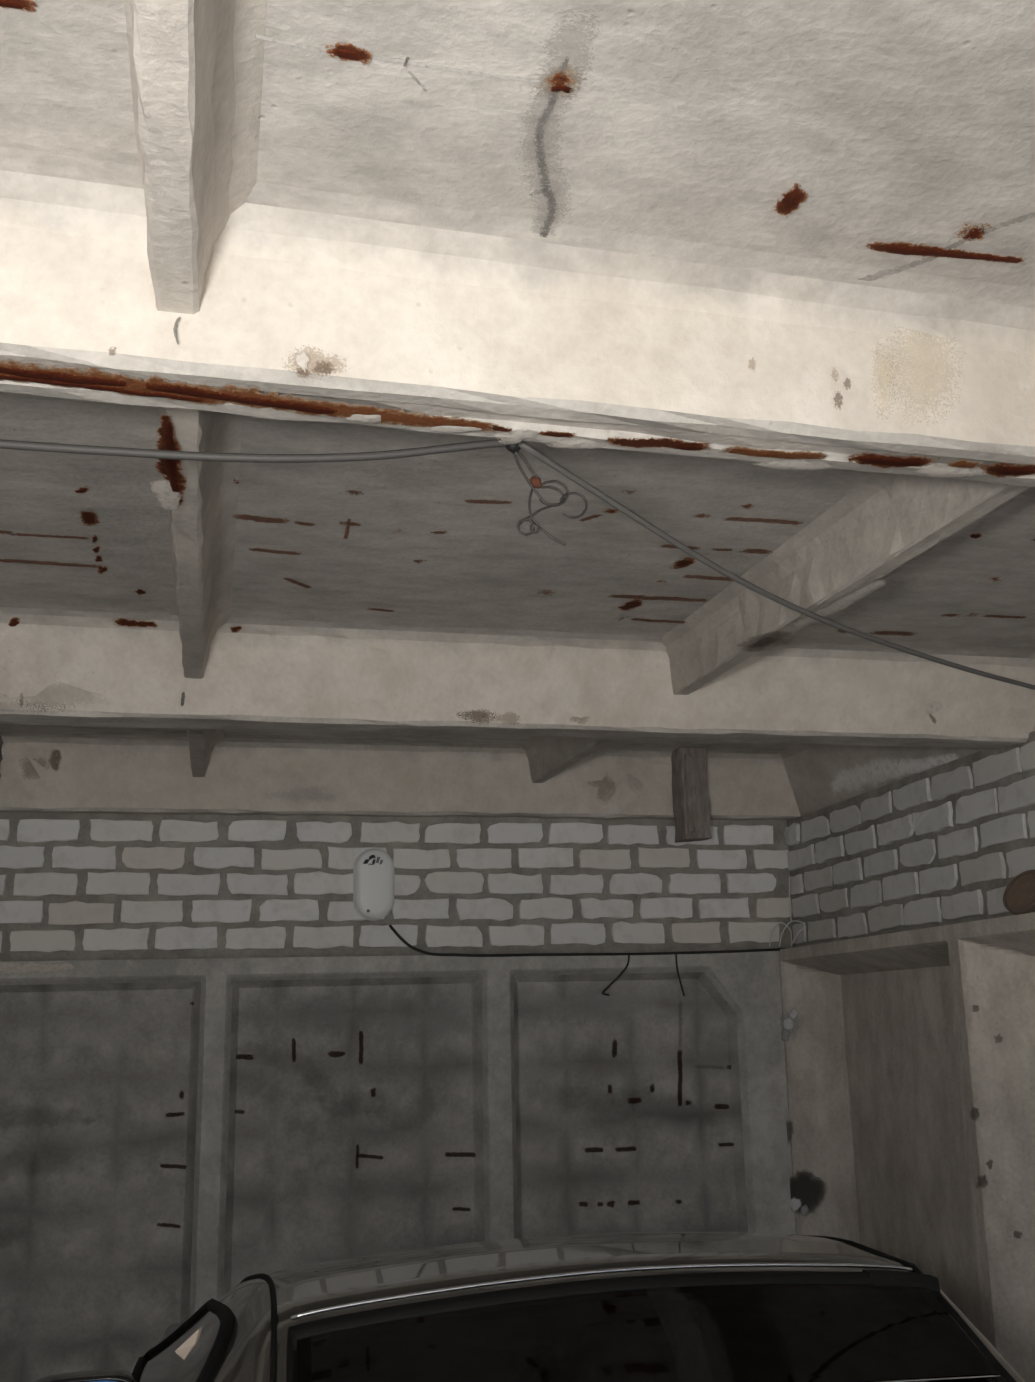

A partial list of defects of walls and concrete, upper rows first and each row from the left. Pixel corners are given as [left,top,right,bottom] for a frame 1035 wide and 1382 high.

rust [0,0,38,13]
rust [325,42,372,66]
rust [535,64,584,100]
rust [775,183,808,216]
rust [864,222,1026,264]
rust [0,358,1035,478]
rust [0,486,108,574]
rust [232,513,316,526]
rust [339,519,361,539]
rust [691,504,804,525]
rust [609,544,772,624]
rust [114,618,157,628]